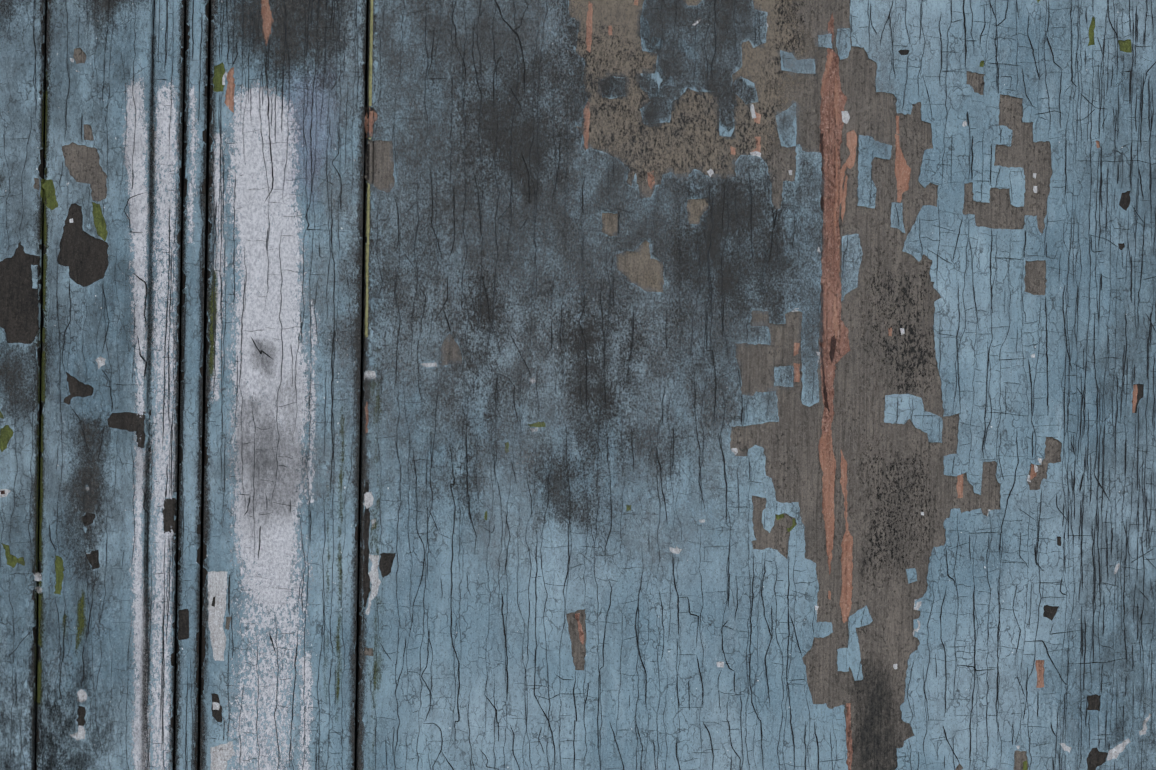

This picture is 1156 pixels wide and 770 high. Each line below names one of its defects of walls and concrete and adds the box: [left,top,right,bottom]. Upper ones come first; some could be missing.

peeling [0,241,41,344]
peeling [57,124,109,287]
peeling [107,75,199,770]
peeling [209,67,320,770]
crack [0,0,847,770]
leakage [353,0,823,525]
peeling [566,0,1001,770]
crack [824,0,1156,770]
peeling [962,94,1052,233]
peeling [1024,260,1047,295]
peeling [1027,437,1062,490]
peeling [1086,747,1108,770]